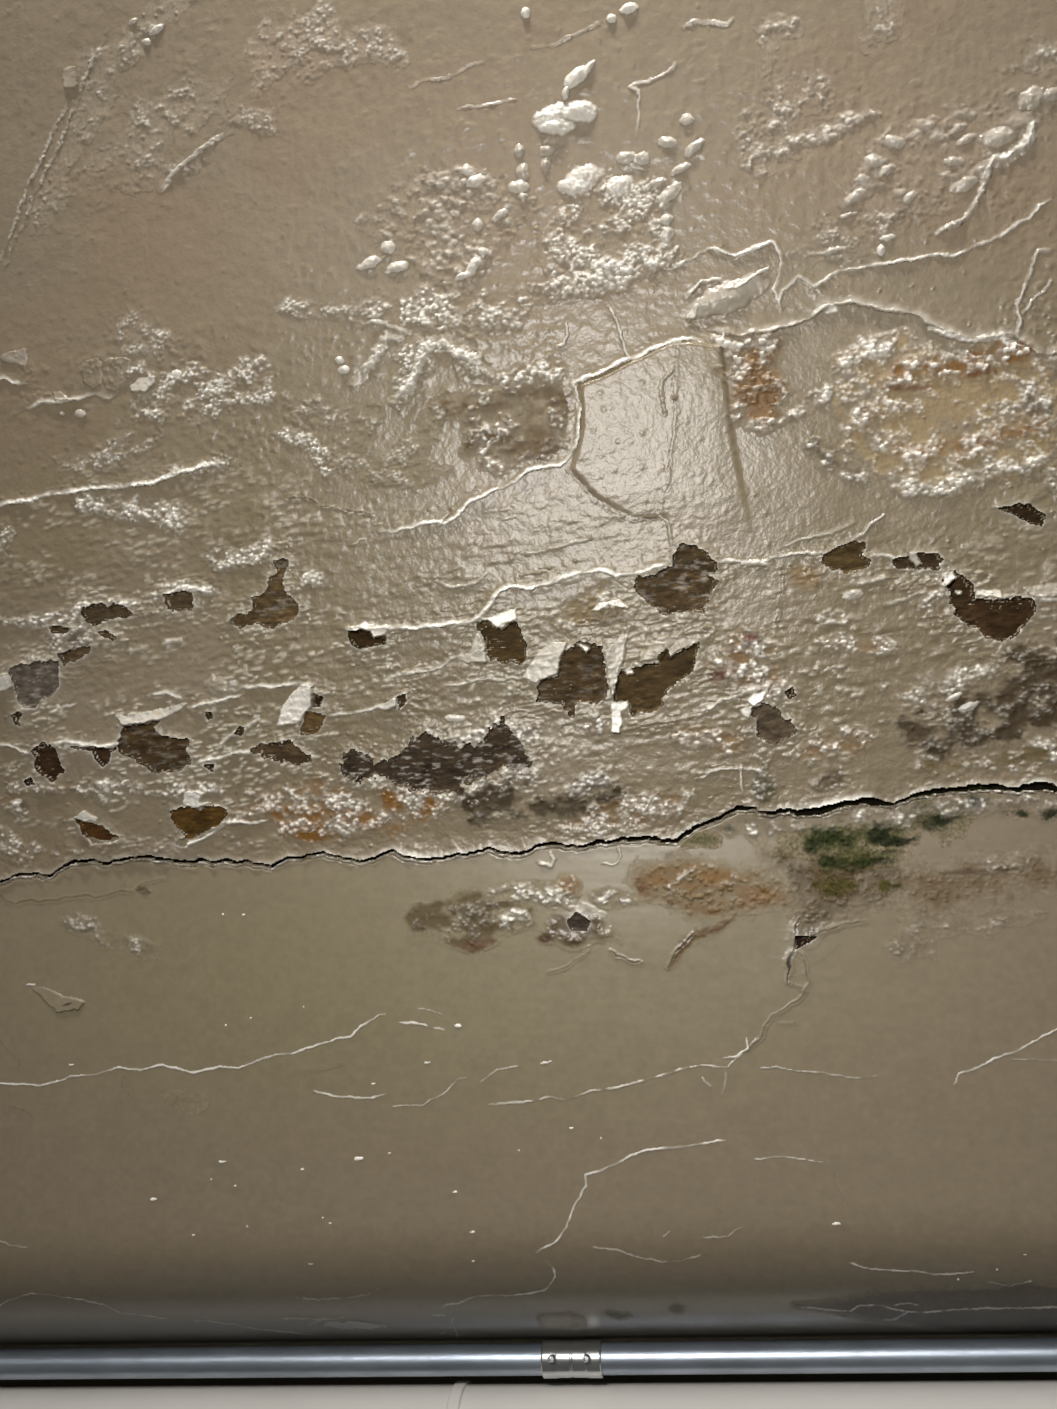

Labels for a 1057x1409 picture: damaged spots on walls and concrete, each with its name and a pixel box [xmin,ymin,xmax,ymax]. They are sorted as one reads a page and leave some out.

spalling [976,481,1057,550]
spalling [785,517,1057,663]
spalling [0,521,848,841]
crack [0,760,1057,909]
peeling [721,793,1057,848]
spalling [401,886,625,953]
rust [622,846,788,972]
crack [0,970,879,1108]
crack [952,1028,1057,1085]
crack [431,1139,1057,1339]